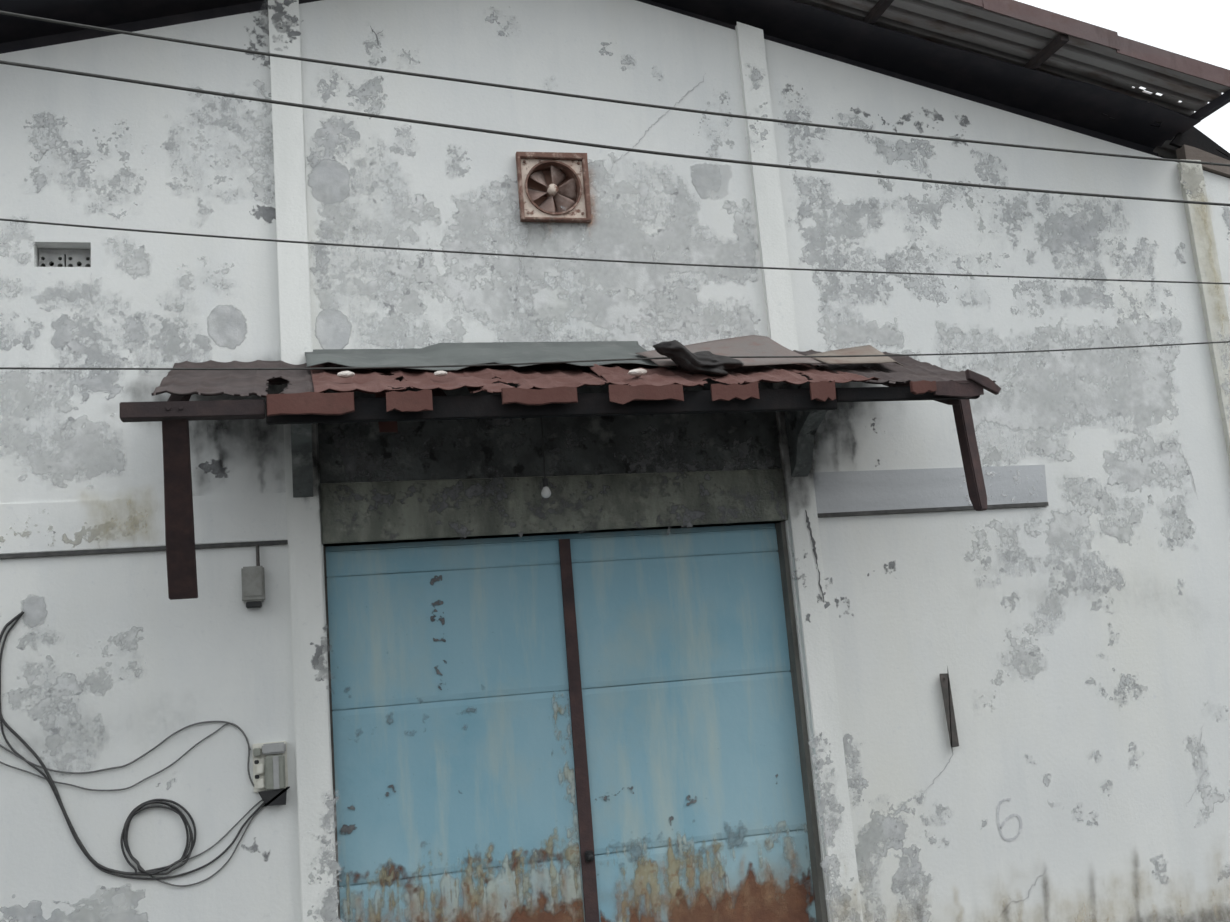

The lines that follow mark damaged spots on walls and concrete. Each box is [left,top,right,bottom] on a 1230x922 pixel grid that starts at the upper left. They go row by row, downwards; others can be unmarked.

peeling [318,74,385,118]
peeling [24,113,143,218]
peeling [307,117,760,349]
peeling [0,285,212,410]
peeling [782,85,1194,685]
peeling [199,459,227,478]
crack [805,510,824,603]
peeling [8,626,143,768]
peeling [0,886,148,922]
rust [340,697,584,922]
rust [601,816,815,922]
peeling [809,732,949,922]